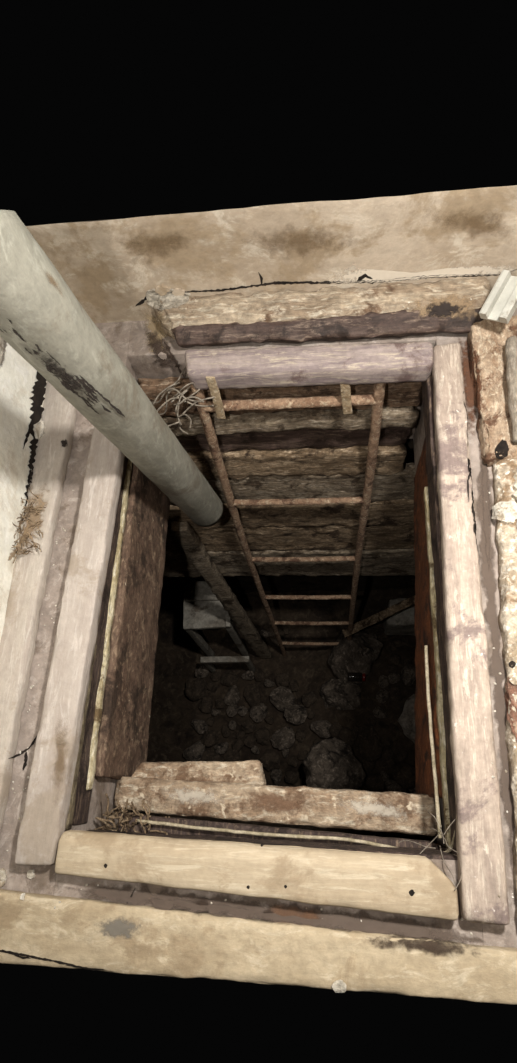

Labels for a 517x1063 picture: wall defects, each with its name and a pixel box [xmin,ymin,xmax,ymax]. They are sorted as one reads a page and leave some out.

crack [136,269,517,306]
crack [23,371,47,516]
crack [8,736,37,770]
leakage [82,884,483,955]
crack [0,949,114,972]